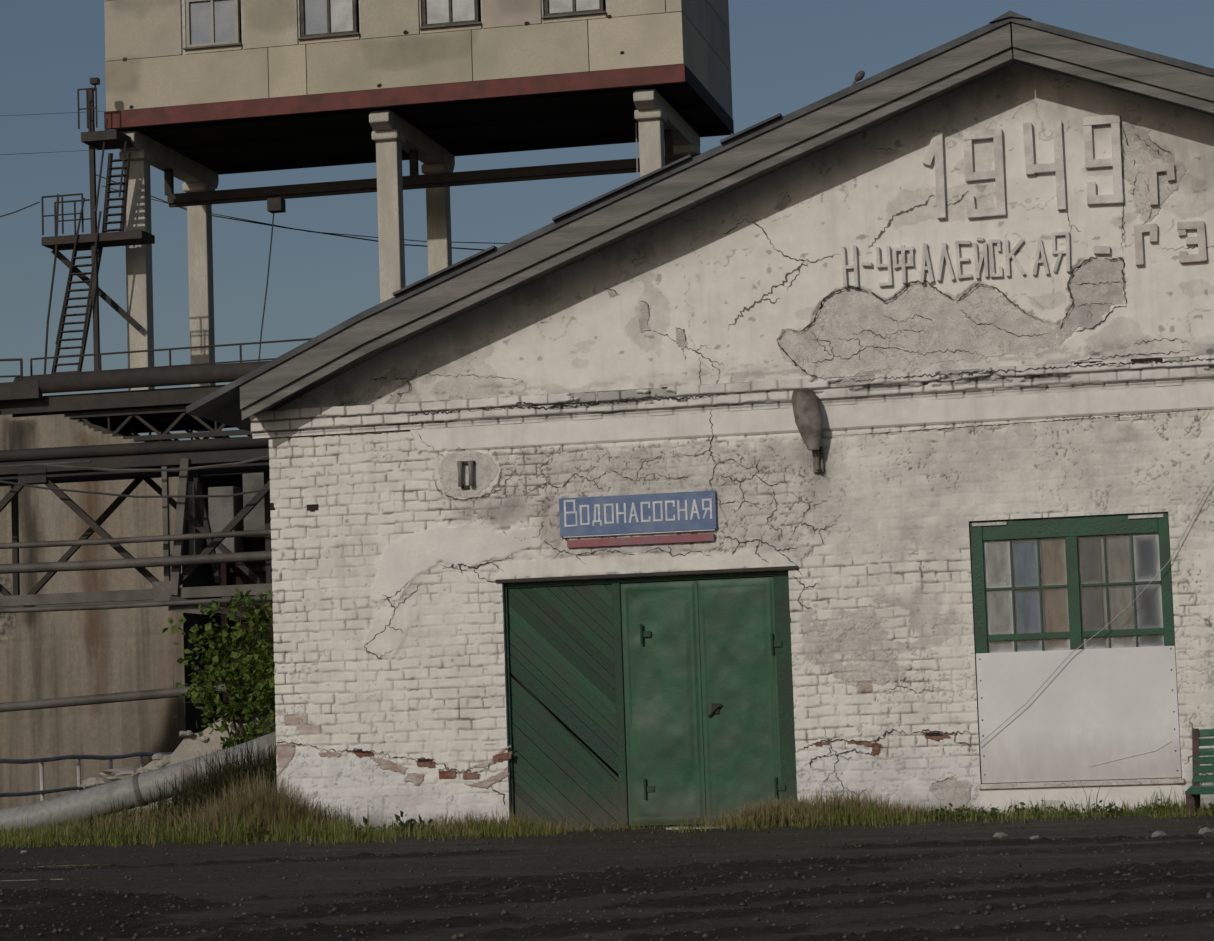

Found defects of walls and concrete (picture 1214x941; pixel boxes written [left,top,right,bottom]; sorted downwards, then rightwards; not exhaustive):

crack [868,191,969,249]
spalling [777,257,1127,378]
crack [409,218,838,609]
peeling [370,523,560,602]
crack [364,562,503,659]
spalling [276,741,512,805]
spalling [796,729,970,767]